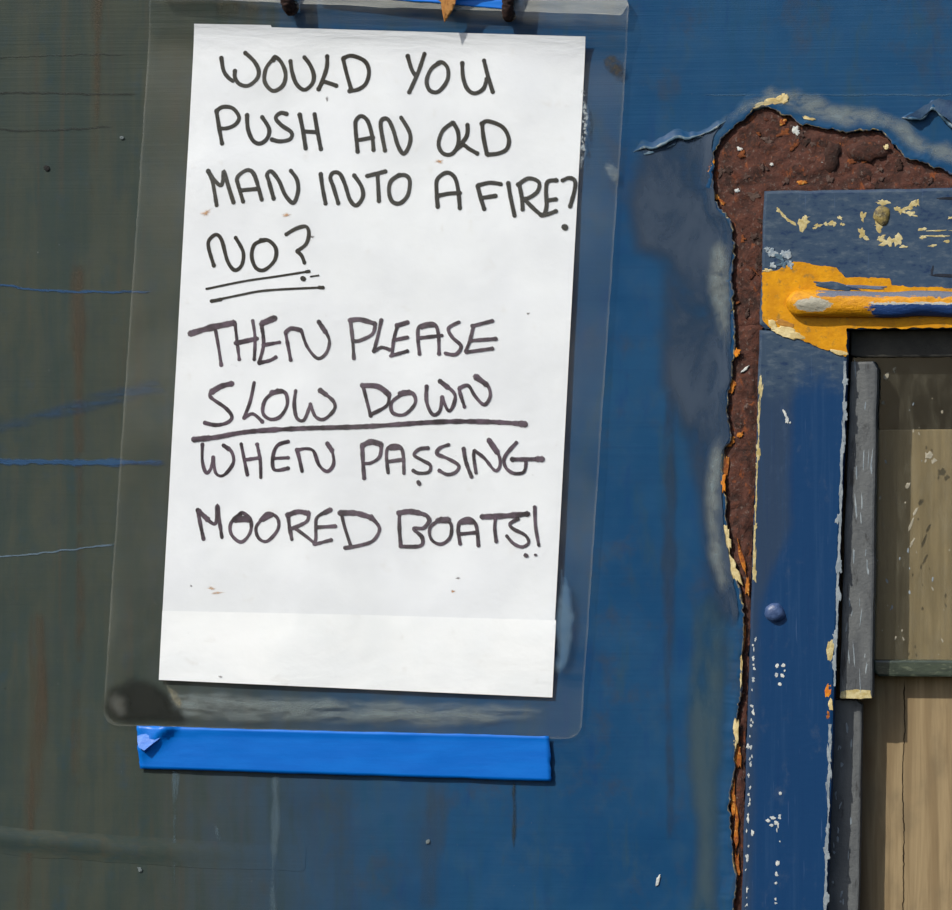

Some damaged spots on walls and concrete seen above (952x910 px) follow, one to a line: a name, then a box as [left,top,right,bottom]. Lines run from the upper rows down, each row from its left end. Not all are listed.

peeling [902,98,952,128]
peeling [776,207,845,232]
peeling [858,212,908,248]
peeling [876,199,952,247]
peeling [761,247,952,686]
corrosion [697,87,952,910]